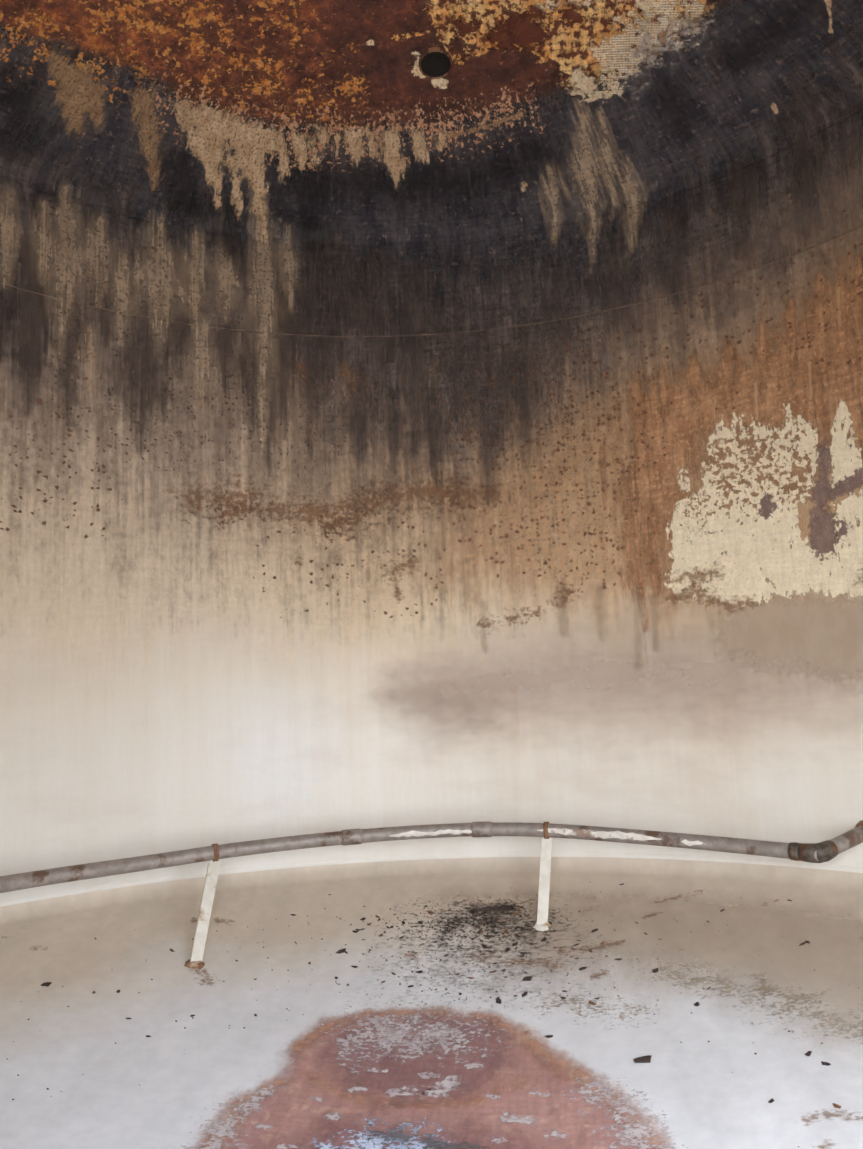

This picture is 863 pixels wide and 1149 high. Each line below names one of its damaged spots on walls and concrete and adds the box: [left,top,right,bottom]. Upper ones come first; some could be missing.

rust [391,0,462,67]
peeling [411,52,449,89]
peeling [443,0,716,104]
peeling [824,0,834,33]
damp [0,48,863,533]
rust [600,256,863,612]
rust [170,470,501,541]
peeling [664,400,863,607]
damp [429,900,863,1001]
rust [204,1010,662,1149]